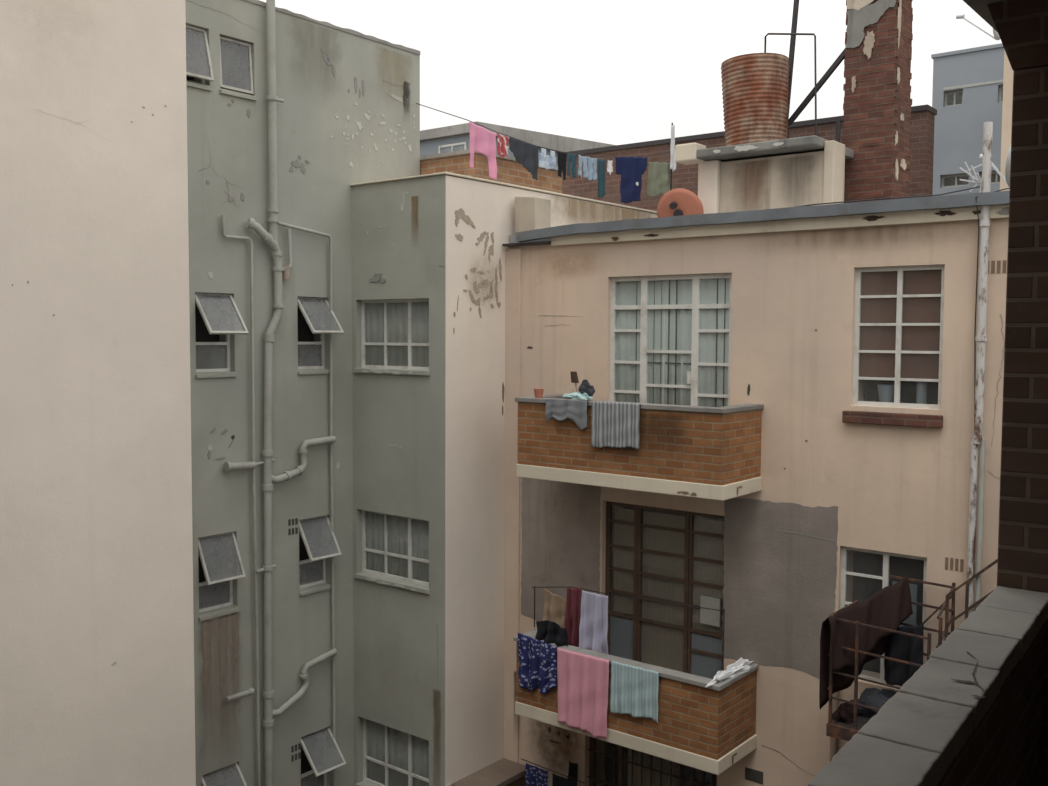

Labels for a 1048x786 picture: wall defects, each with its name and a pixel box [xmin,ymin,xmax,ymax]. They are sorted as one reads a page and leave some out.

peeling [330,77,415,165]
flaking render [895,159,907,180]
flaking render [453,208,502,333]